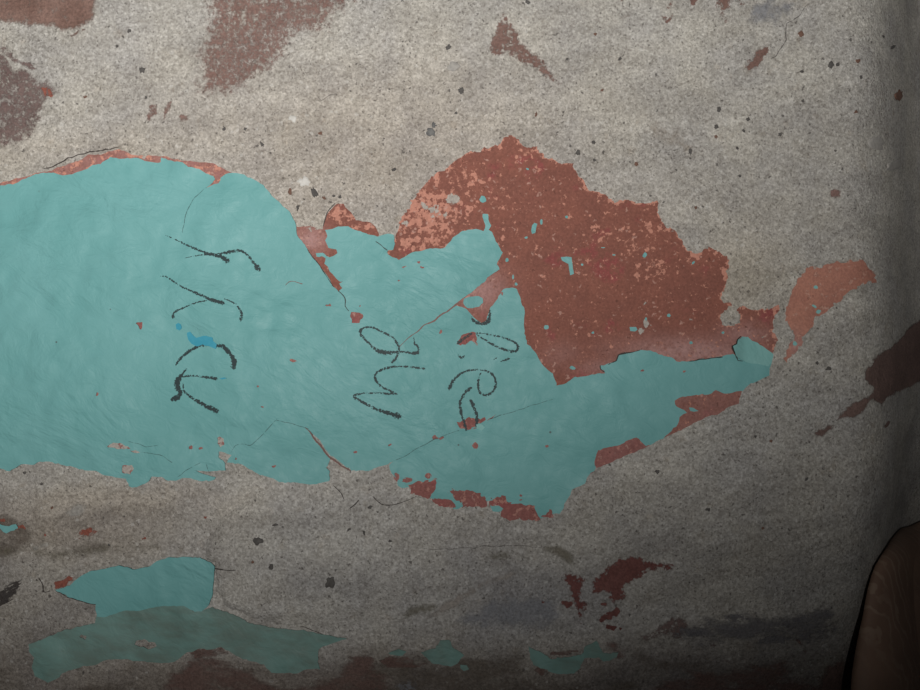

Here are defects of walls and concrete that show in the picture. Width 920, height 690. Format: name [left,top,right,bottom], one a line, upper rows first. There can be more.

crack [44,147,117,169]
peeling [0,135,878,521]
leakage [815,321,920,436]